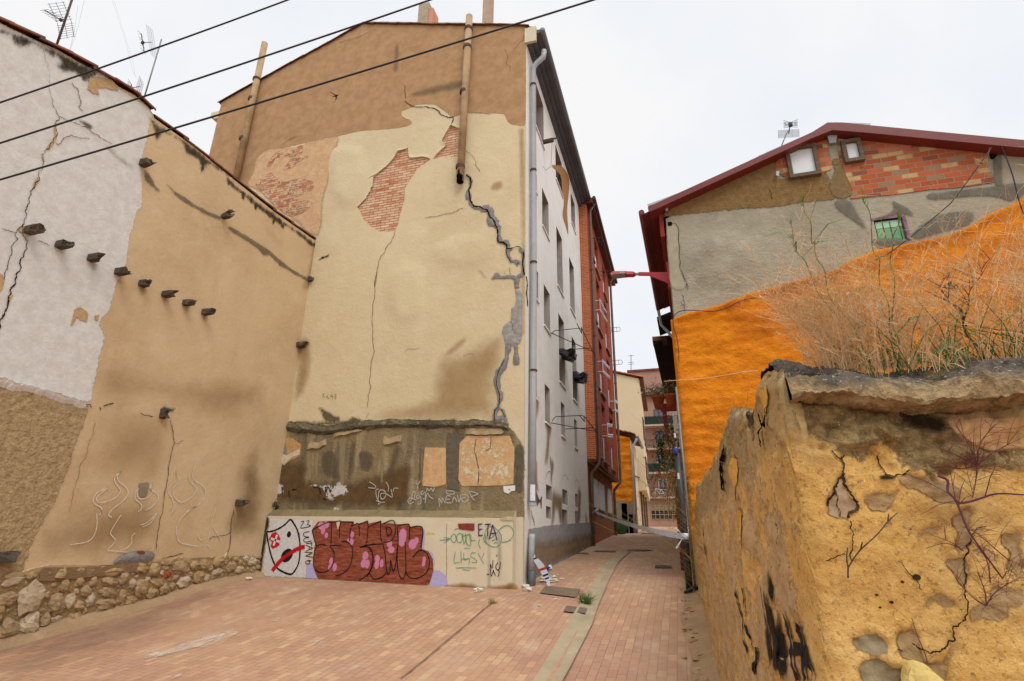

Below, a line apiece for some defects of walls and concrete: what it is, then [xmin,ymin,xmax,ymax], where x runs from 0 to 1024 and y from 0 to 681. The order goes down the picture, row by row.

crack [0,49,112,328]
water stain [145,172,311,285]
water stain [182,141,315,247]
flaking render [248,137,338,235]
flaking render [358,122,460,232]
flaking render [816,138,998,198]
crack [366,232,395,417]
water stain [429,349,494,412]
crack [425,151,528,482]
peeling [422,428,515,487]
flaking render [794,403,1024,518]
crack [897,526,987,654]